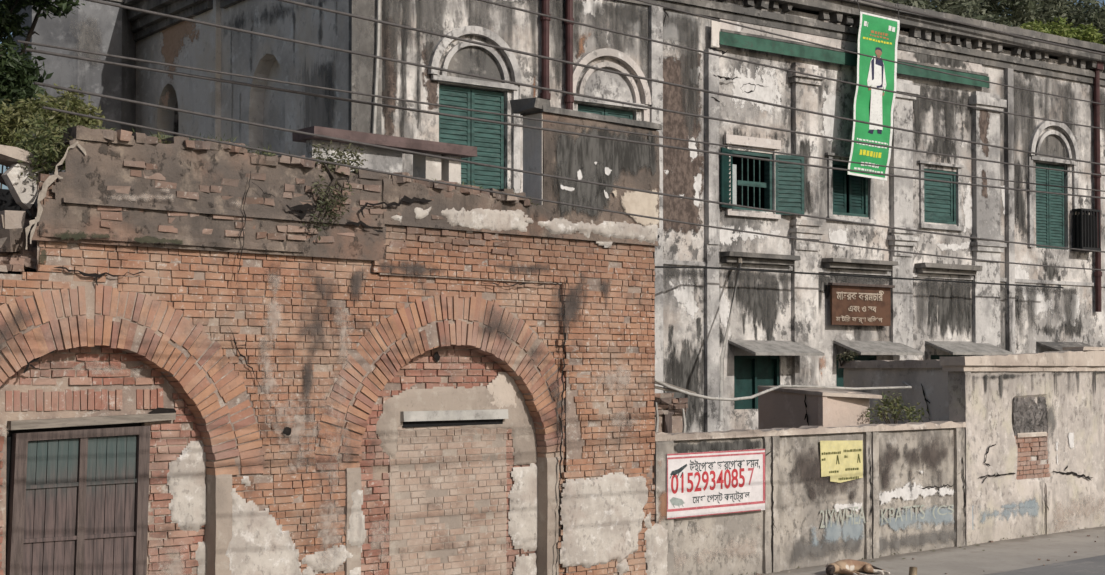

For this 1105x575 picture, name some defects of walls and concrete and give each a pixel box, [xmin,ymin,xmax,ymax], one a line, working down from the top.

damp [354,0,444,137]
flaking render [107,44,704,256]
damp [913,84,971,164]
damp [984,72,1076,236]
crack [236,171,317,284]
crack [347,195,432,233]
damp [719,271,792,341]
damp [1000,259,1084,339]
flaking render [167,441,207,575]
flaking render [225,476,366,575]
flaking render [508,463,538,575]
flaking render [560,472,668,575]